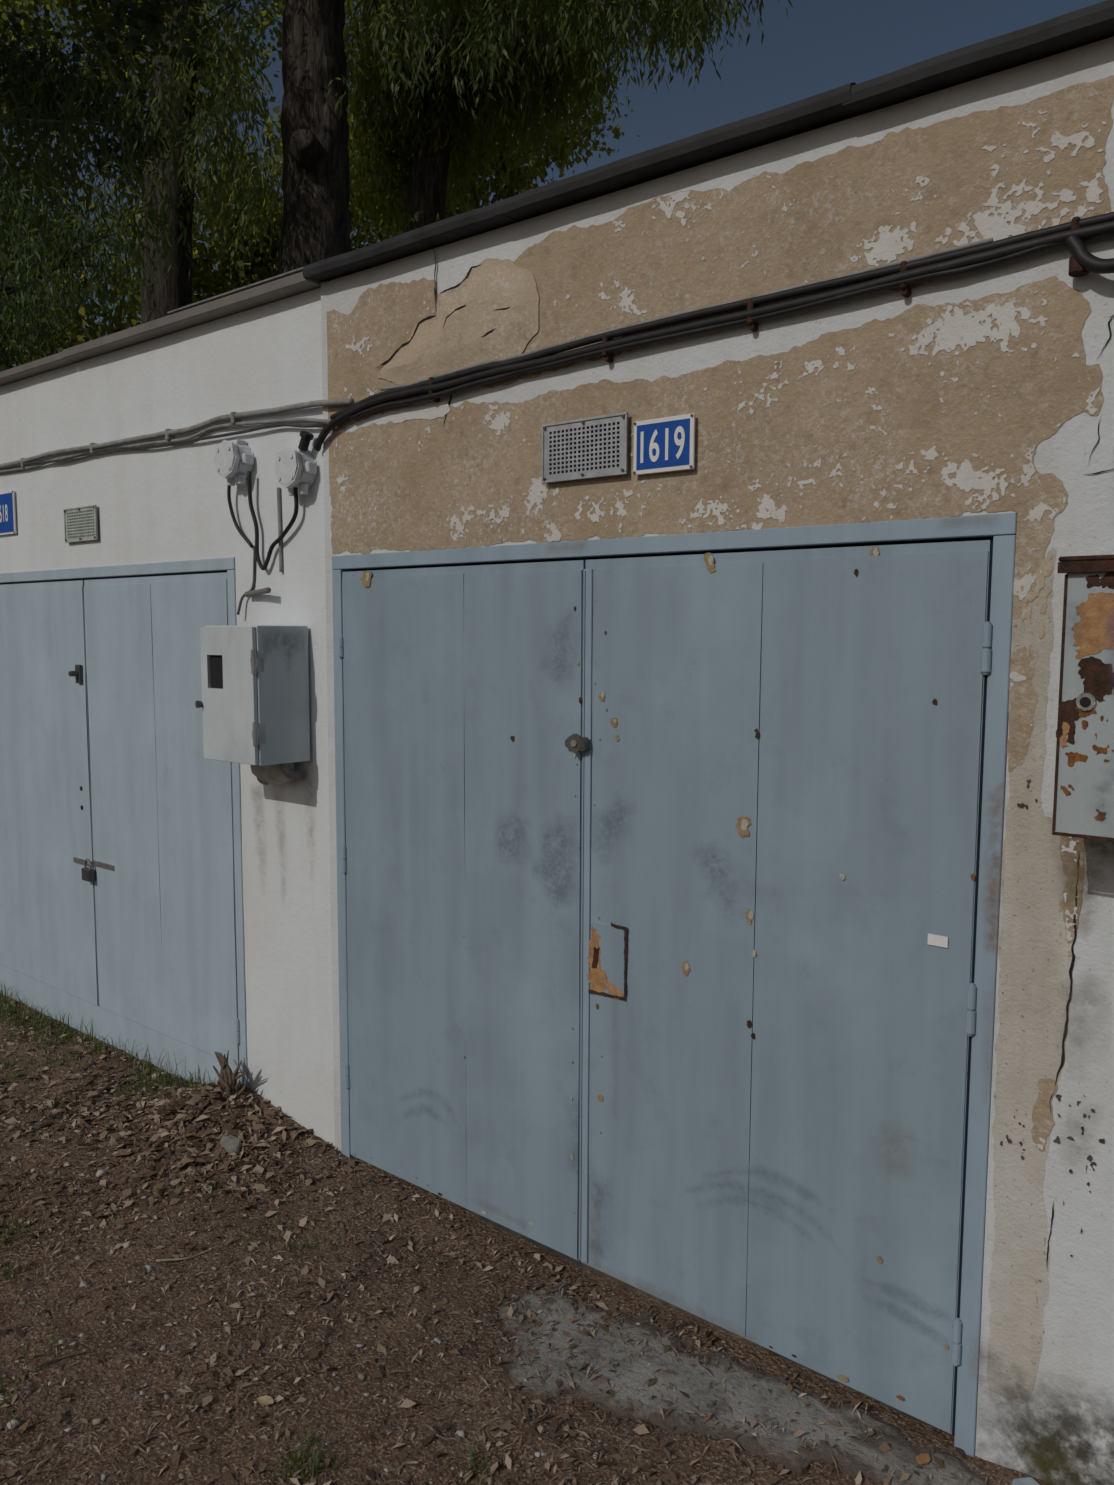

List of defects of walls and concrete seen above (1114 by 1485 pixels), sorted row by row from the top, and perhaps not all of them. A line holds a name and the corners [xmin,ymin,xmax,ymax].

crack [375,251,510,369]
peeling [327,75,1114,1405]
rust [587,923,628,1001]
crack [1049,853,1080,1110]
crack [1046,1204,1054,1262]
mould [1009,1406,1114,1485]